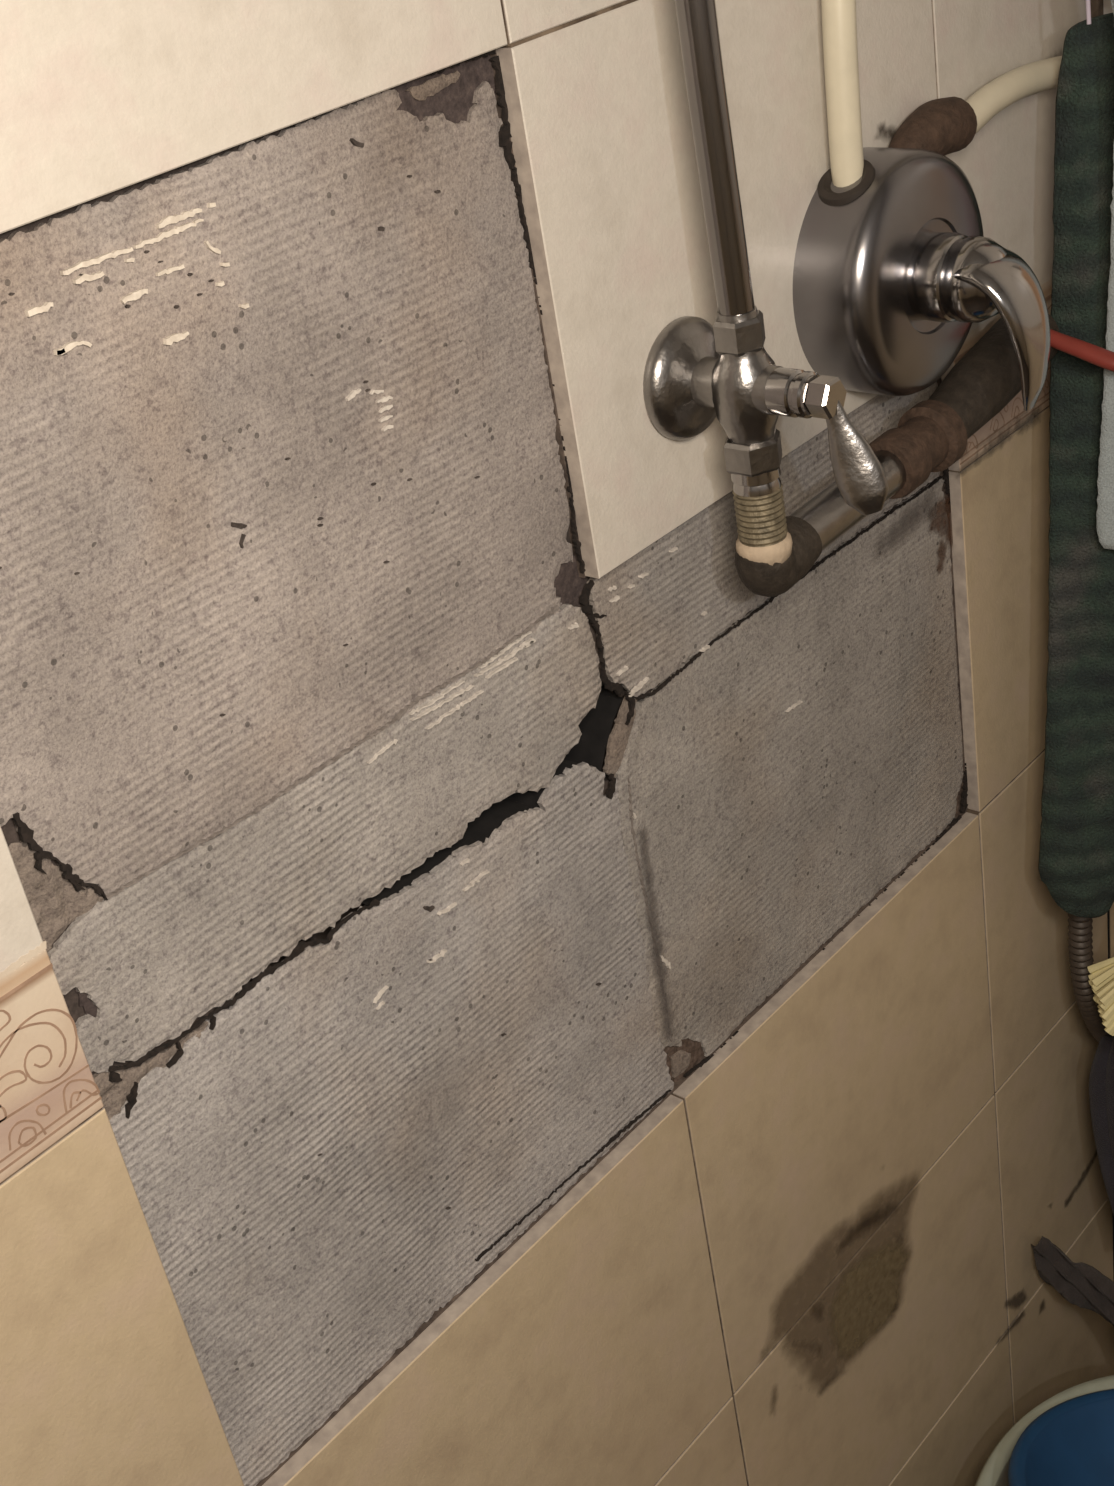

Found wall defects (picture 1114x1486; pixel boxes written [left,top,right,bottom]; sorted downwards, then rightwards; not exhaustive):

spalling [390,54,496,123]
crack [406,50,543,315]
spalling [0,81,573,895]
spalling [779,428,835,517]
spalling [848,381,938,444]
crack [13,384,968,1261]
spalling [8,472,963,1486]
leakage [776,1183,914,1385]